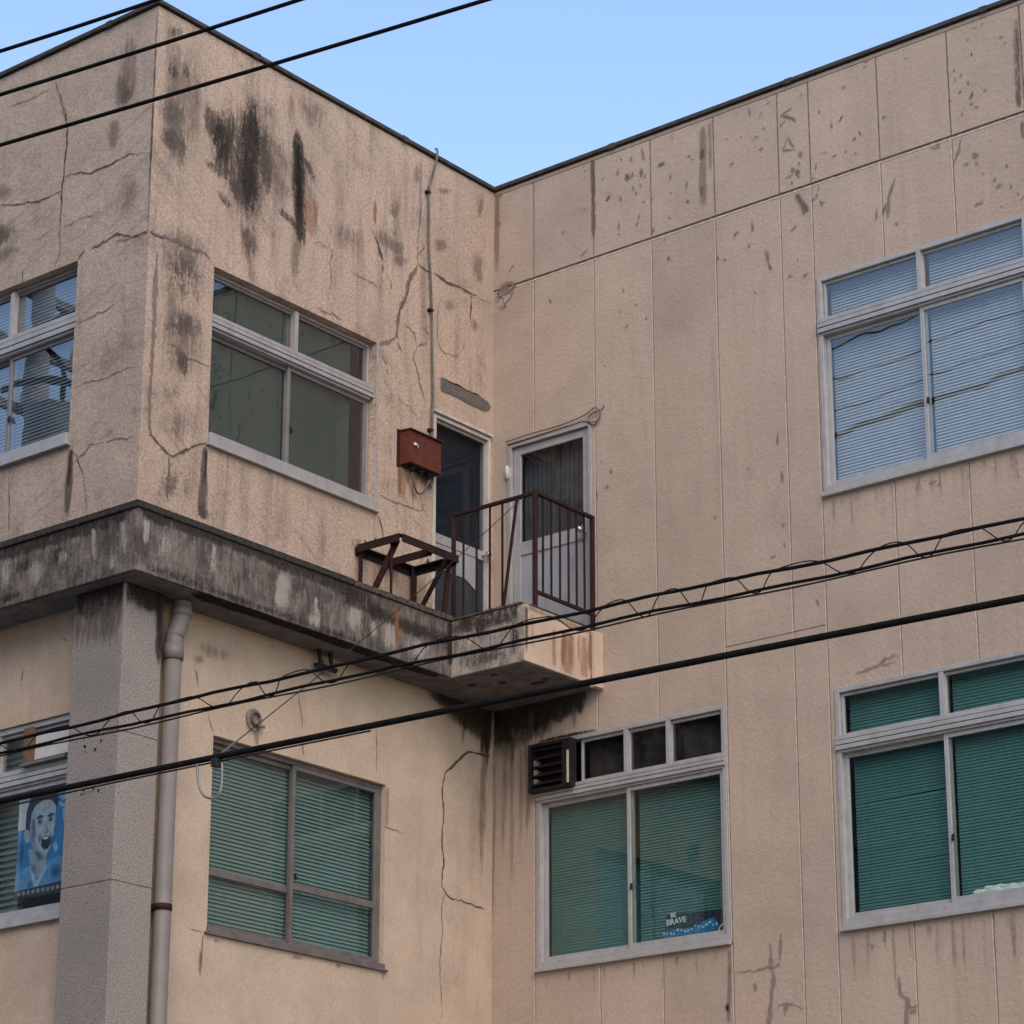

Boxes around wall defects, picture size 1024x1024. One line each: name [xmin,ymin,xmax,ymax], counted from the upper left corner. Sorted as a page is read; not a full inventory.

crack [2,23,210,500]
water stain [164,106,186,152]
water stain [175,260,199,292]
water stain [205,102,272,210]
water stain [242,228,256,253]
water stain [280,132,315,243]
crack [316,167,515,411]
water stain [0,512,127,602]
water stain [143,447,528,677]
water stain [432,691,594,821]
crack [440,751,484,1019]
crack [737,935,802,1024]